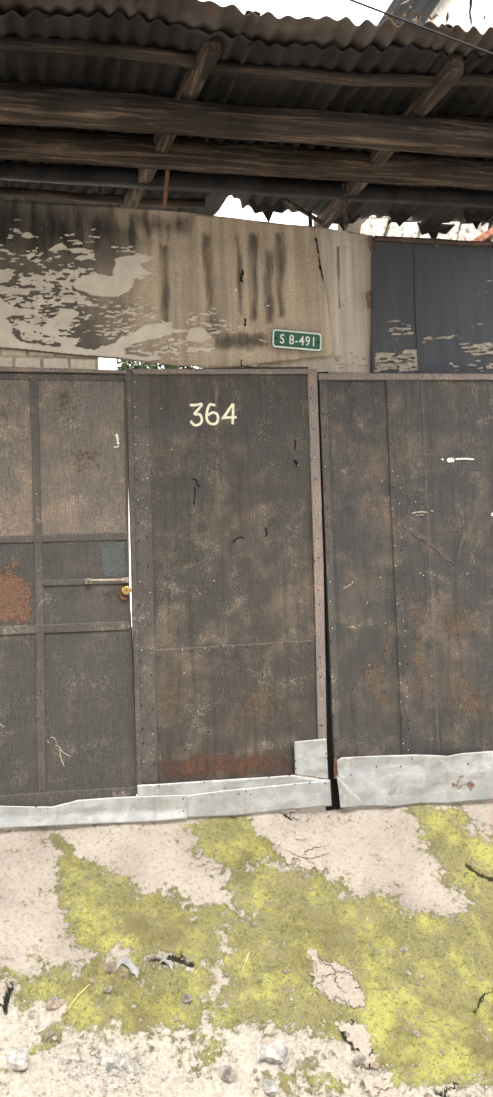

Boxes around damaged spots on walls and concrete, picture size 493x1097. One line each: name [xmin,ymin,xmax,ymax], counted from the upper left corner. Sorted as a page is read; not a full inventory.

peeling [0,219,243,362]
peeling [335,320,493,372]
corrosion [0,562,35,625]